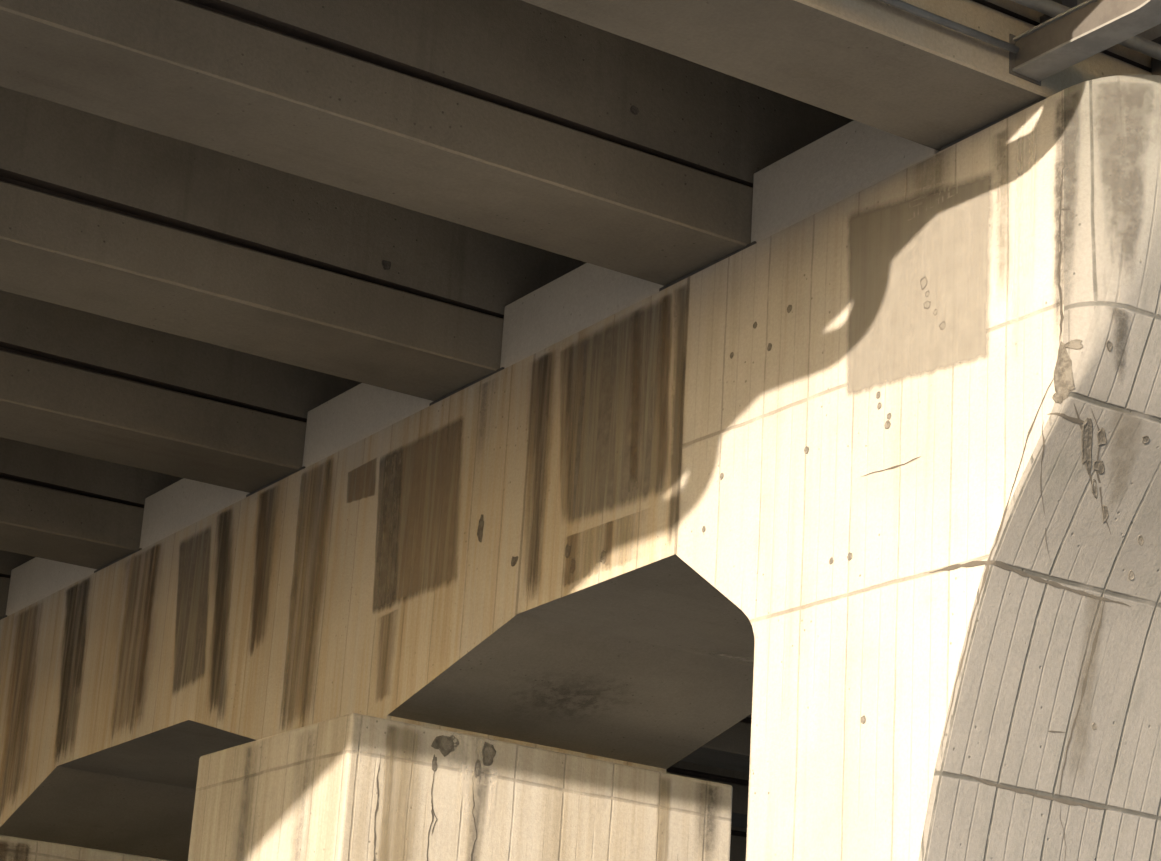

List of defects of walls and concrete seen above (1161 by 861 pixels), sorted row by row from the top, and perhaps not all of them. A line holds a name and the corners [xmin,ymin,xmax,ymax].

leakage [1057,94,1076,277]
leakage [662,289,686,535]
spalling [1052,339,1083,404]
crack [864,457,919,476]
spalling [1082,418,1108,523]
leakage [57,579,89,753]
spalling [431,735,459,772]
spalling [474,742,496,778]
crack [427,774,438,861]
crack [470,777,478,861]